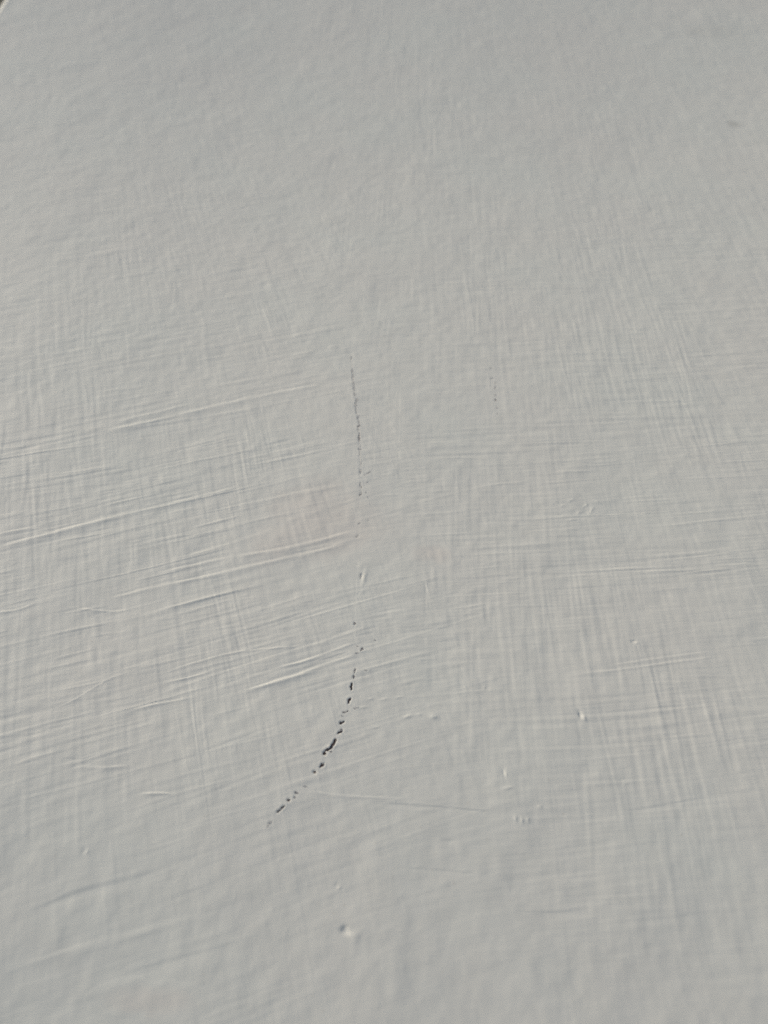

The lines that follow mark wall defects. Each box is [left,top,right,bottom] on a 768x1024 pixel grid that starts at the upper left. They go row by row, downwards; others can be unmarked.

crack [350,356,371,496]
crack [267,575,376,827]